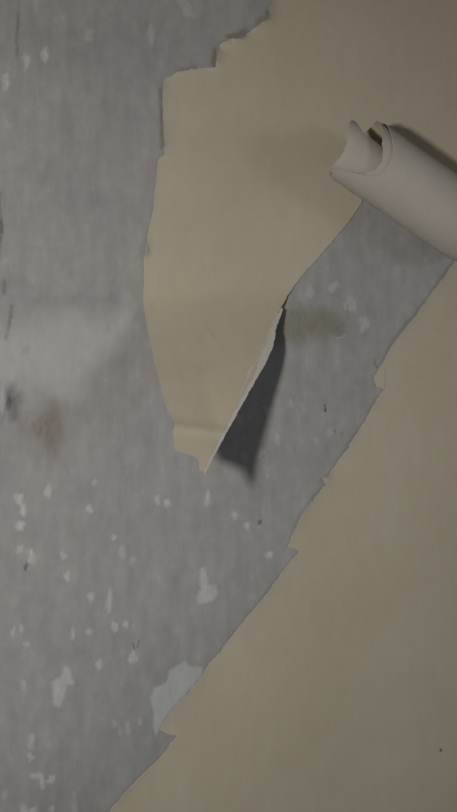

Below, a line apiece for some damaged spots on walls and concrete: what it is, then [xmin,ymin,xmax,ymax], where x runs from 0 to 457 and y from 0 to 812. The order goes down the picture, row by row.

peeling [143,277,300,474]
peeling [194,565,222,607]
peeling [49,661,77,710]